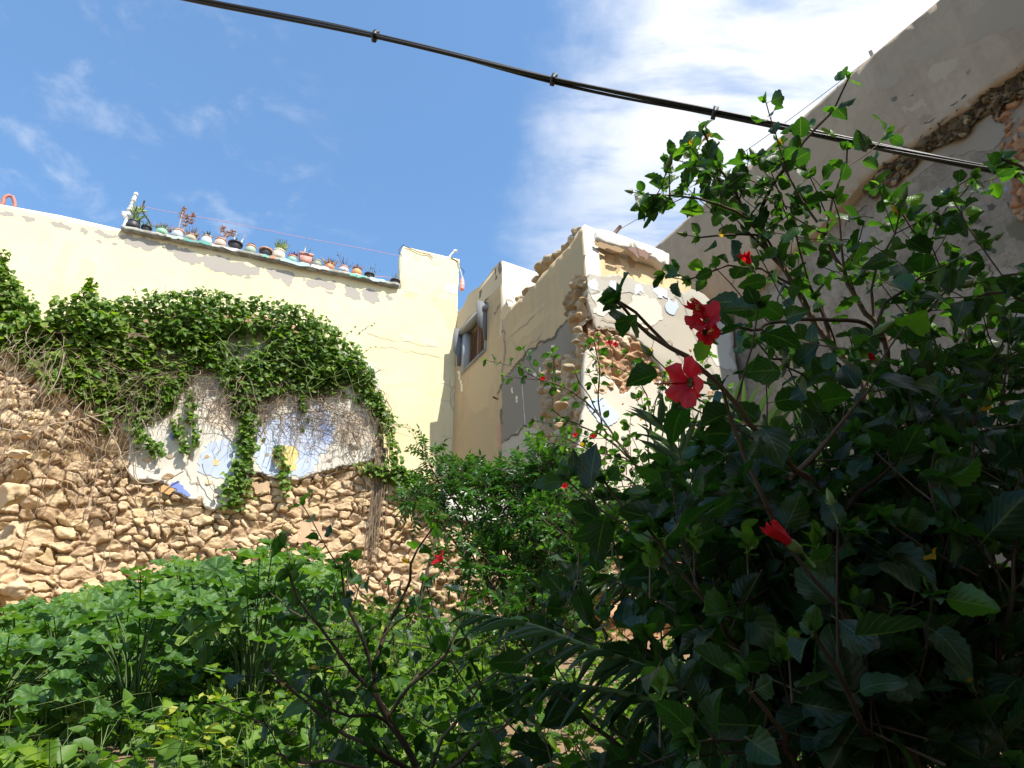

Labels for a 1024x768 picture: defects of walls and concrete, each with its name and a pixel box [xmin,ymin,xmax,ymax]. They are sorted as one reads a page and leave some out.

flaking render [991,99,1024,221]
spalling [594,241,652,259]
crack [485,296,567,394]